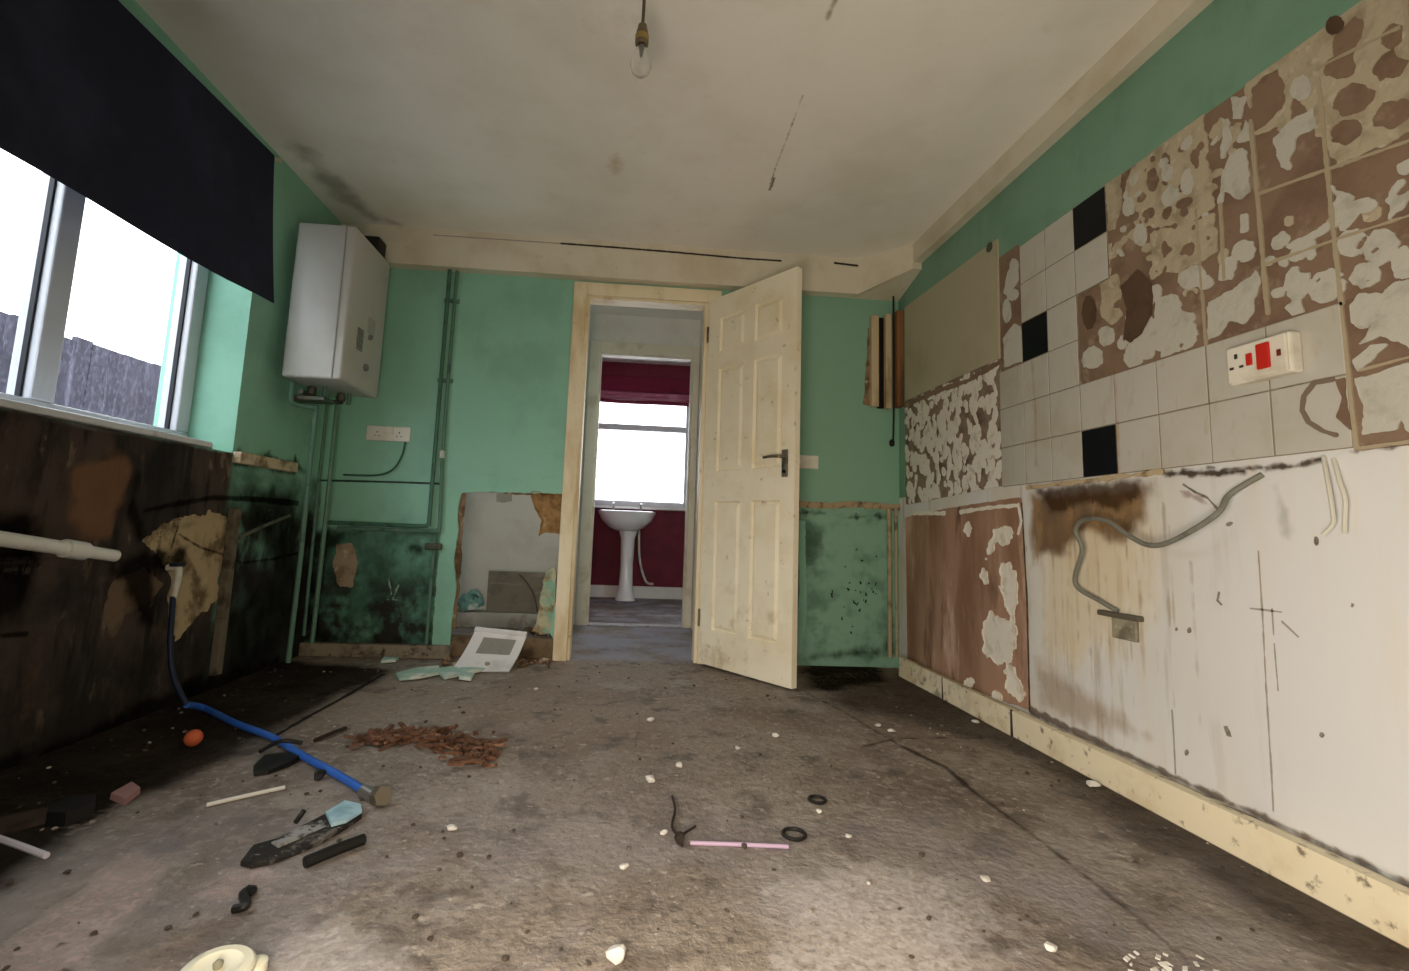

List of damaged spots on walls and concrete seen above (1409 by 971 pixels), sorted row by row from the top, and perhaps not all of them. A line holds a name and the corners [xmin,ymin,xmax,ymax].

peeling [1077,0,1409,452]
flaking render [103,510,227,641]
spalling [452,493,466,630]
leakage [799,500,900,519]
peeling [904,245,1031,712]
leakage [1025,457,1322,554]
leakage [0,489,387,880]